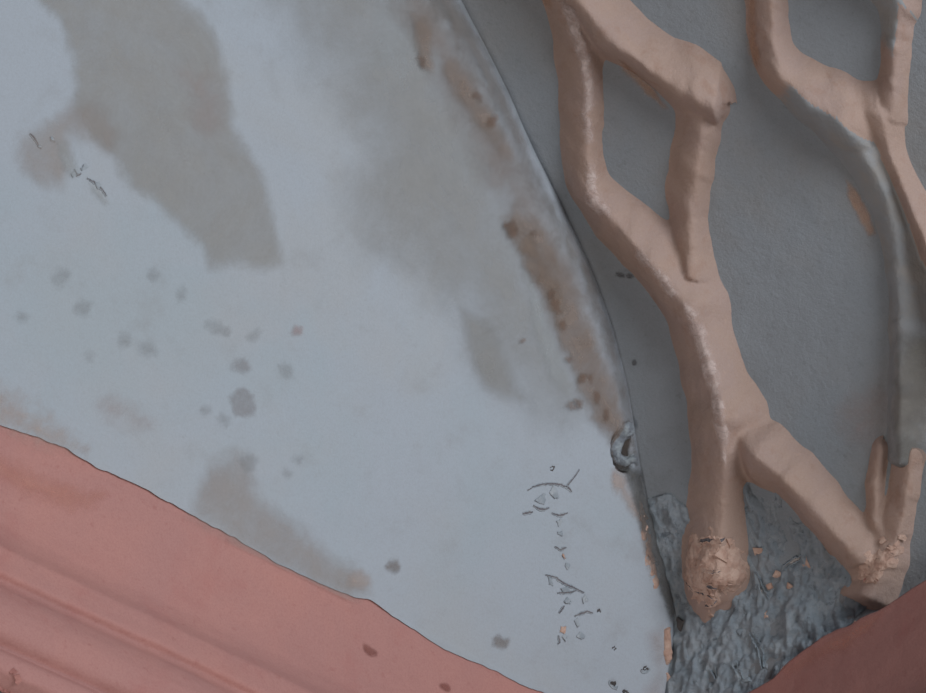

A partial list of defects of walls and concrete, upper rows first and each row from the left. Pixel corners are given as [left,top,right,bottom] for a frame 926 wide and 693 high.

crack [523,469,580,527]
peeling [635,482,907,693]